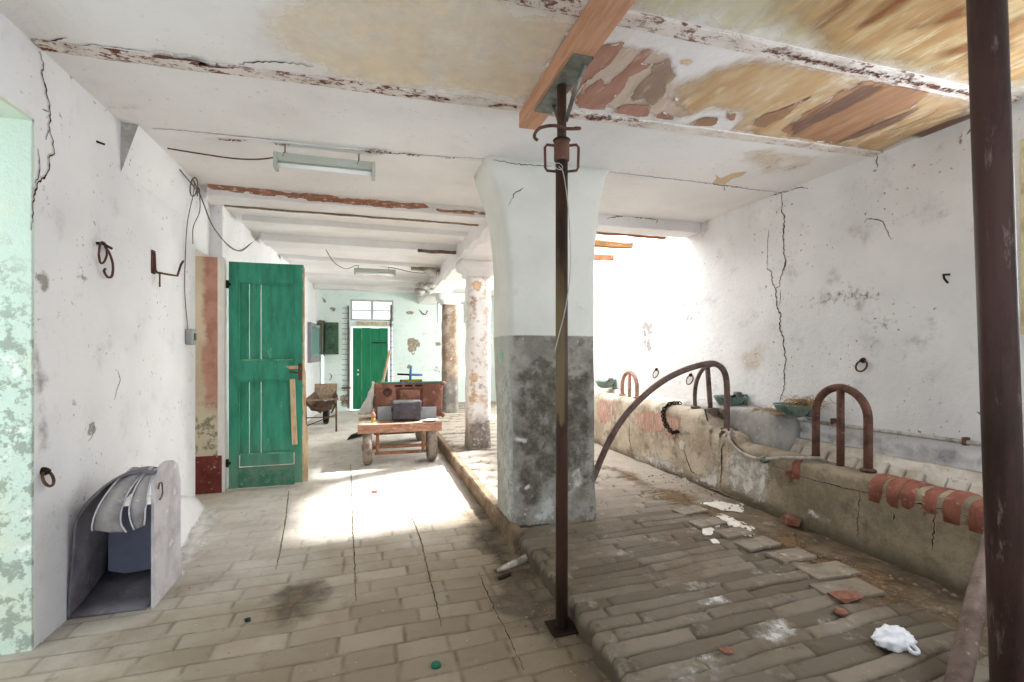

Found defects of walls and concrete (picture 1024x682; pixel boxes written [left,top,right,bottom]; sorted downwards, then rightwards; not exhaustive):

crack [30,37,208,230]
peeling [145,50,236,68]
peeling [570,42,738,127]
peeling [752,81,930,144]
peeling [911,115,970,143]
crack [345,149,550,204]
crack [864,218,893,240]
crack [614,172,808,402]
crack [773,465,969,551]
water stain [276,582,325,619]
crack [410,512,442,628]
crack [478,573,524,670]